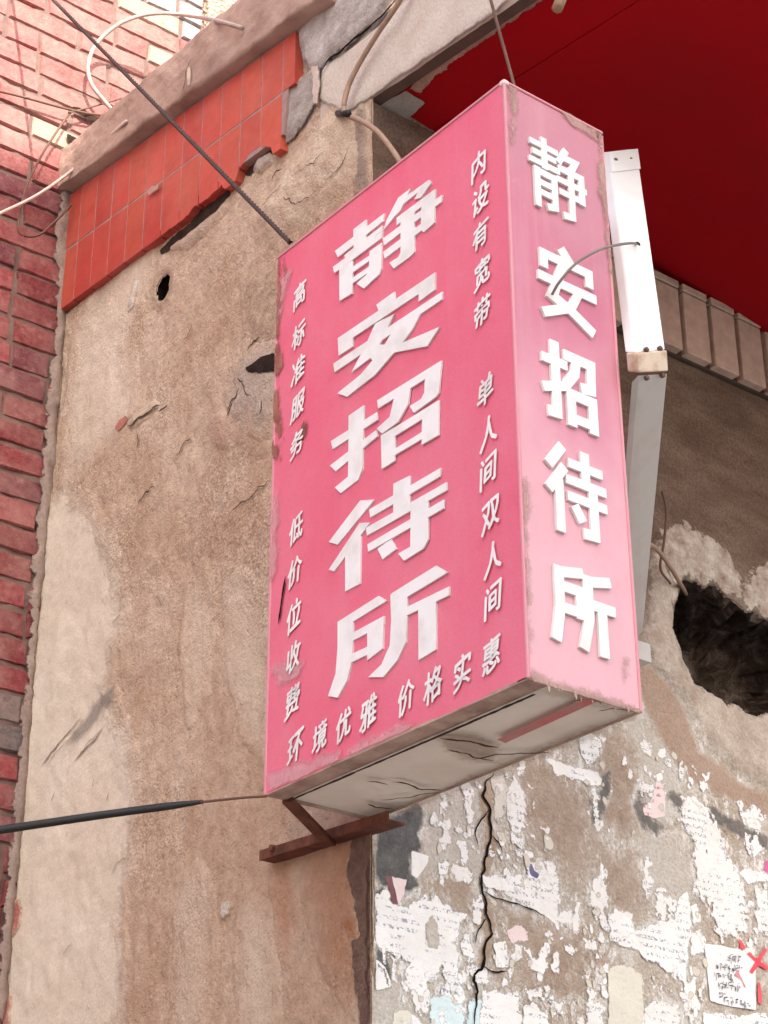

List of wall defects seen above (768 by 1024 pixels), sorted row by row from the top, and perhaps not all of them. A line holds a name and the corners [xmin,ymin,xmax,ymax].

spalling [246,150,275,176]
spalling [127,190,230,313]
flaking render [115,399,167,431]
flaking render [206,259,277,452]
crack [222,479,271,514]
spalling [639,518,768,823]
corrosion [298,815,361,838]
peeling [511,721,649,929]
corrosion [267,840,375,1017]
peeling [420,863,481,921]
crack [472,773,544,1024]
peeling [482,896,594,1004]